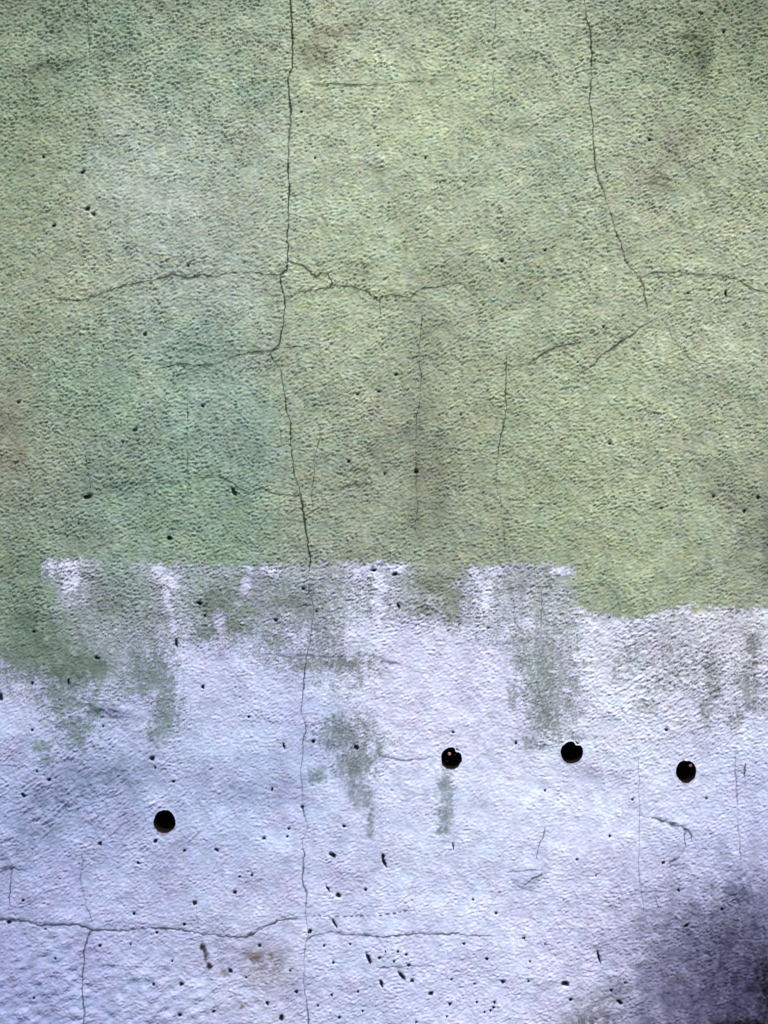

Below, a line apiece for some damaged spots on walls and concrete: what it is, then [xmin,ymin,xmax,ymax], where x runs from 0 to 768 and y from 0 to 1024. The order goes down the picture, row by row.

crack [287,0,435,119]
crack [498,0,768,449]
crack [58,146,461,603]
crack [264,653,330,739]
crack [651,817,692,866]
crack [0,840,493,1024]
water stain [666,912,768,1024]